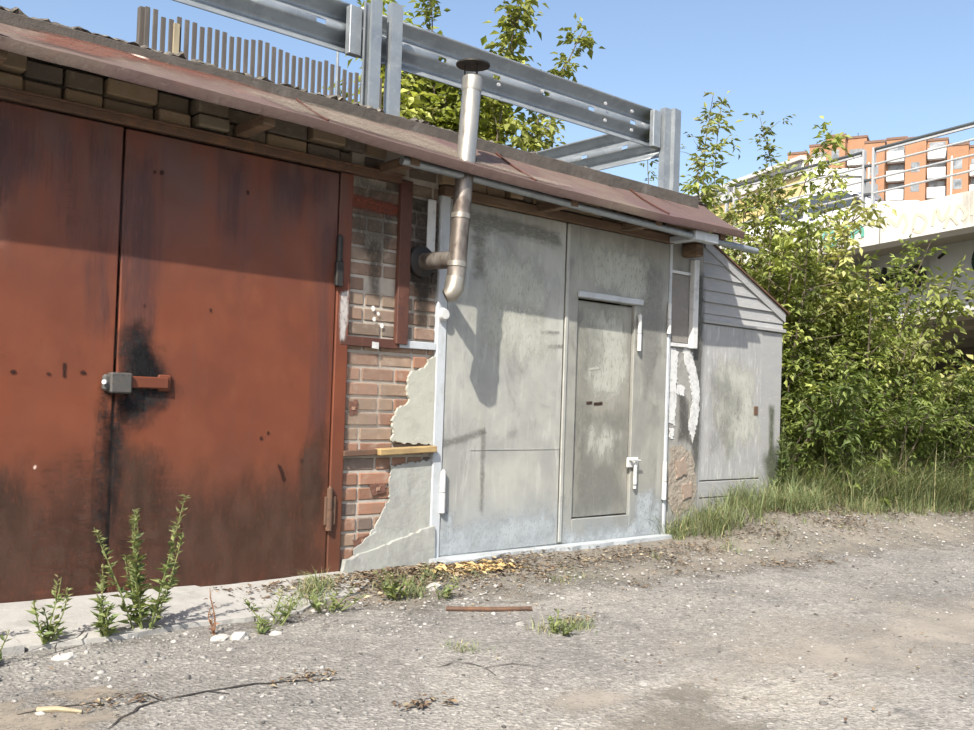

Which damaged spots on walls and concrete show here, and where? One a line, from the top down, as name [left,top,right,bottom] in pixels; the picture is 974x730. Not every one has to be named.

water stain [97,391,155,547]
spalling [370,483,386,496]
spalling [666,347,700,517]
peeling [256,508,974,650]
peeling [0,624,235,692]